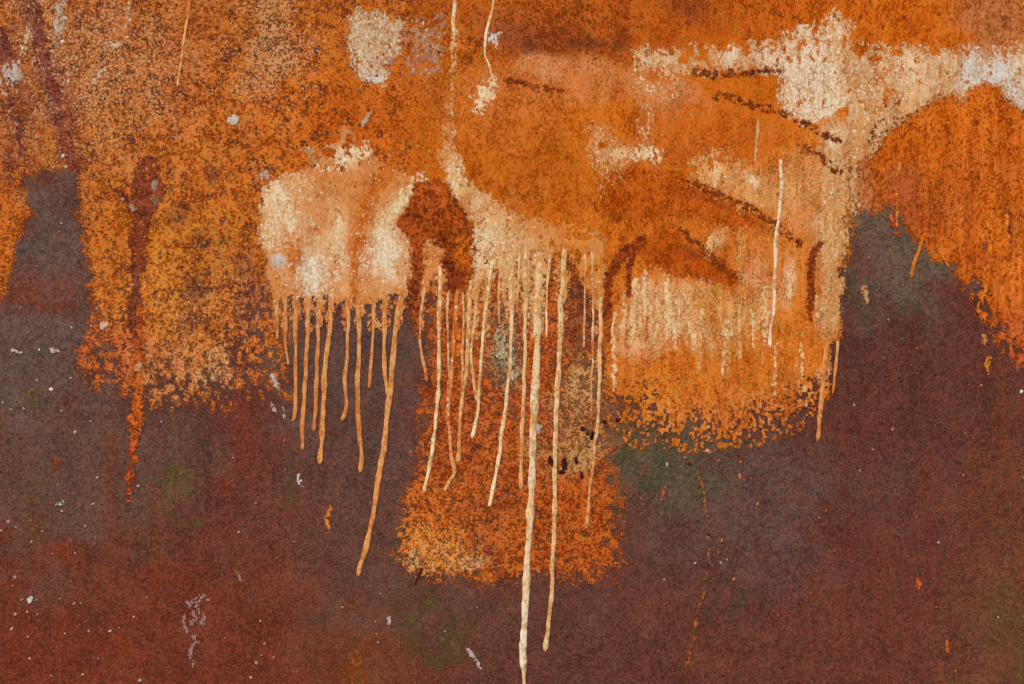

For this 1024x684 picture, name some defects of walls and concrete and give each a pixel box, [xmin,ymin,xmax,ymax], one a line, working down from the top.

corrosion [809,123,842,143]
corrosion [796,140,843,175]
corrosion [676,226,707,247]
corrosion [758,210,780,229]
corrosion [838,61,1024,372]
corrosion [805,241,824,322]
corrosion [388,250,536,595]